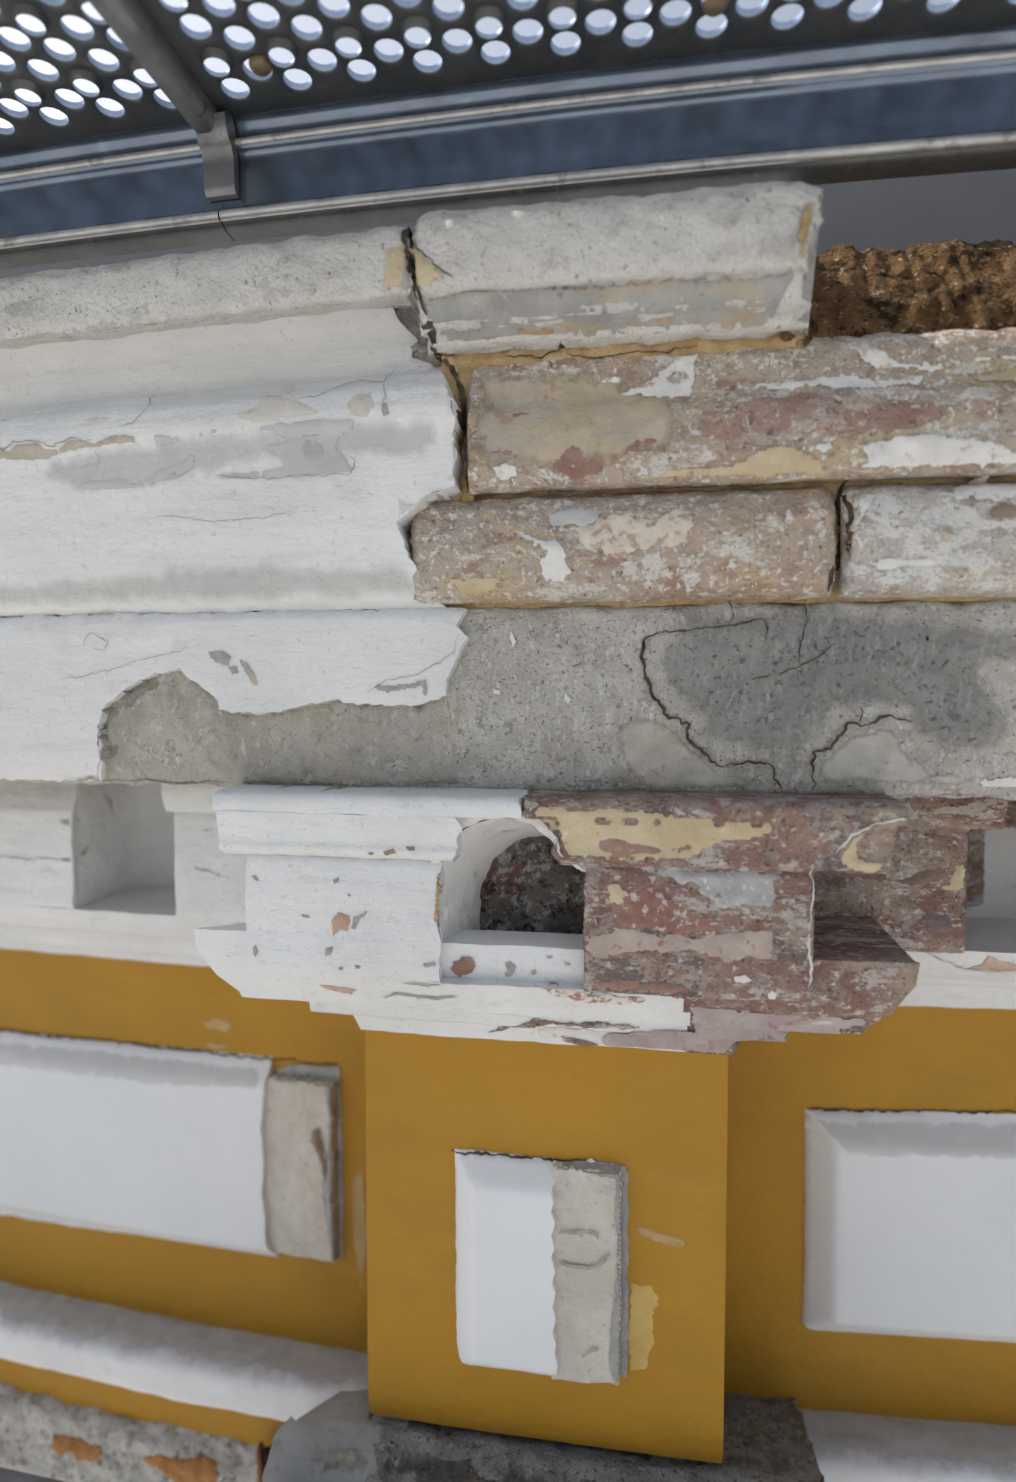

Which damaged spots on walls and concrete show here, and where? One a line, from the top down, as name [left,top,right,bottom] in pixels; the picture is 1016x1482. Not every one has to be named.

peeling [0,434,135,460]
peeling [217,384,389,480]
peeling [598,354,698,399]
flaking render [698,348,1016,517]
peeling [521,506,694,582]
crack [639,480,913,793]
flaking render [63,639,459,792]
flaking render [489,794,1016,1052]
peeling [275,1064,345,1261]
peeling [557,1158,659,1385]
flaking render [52,1434,103,1462]
flaking render [144,1454,219,1482]